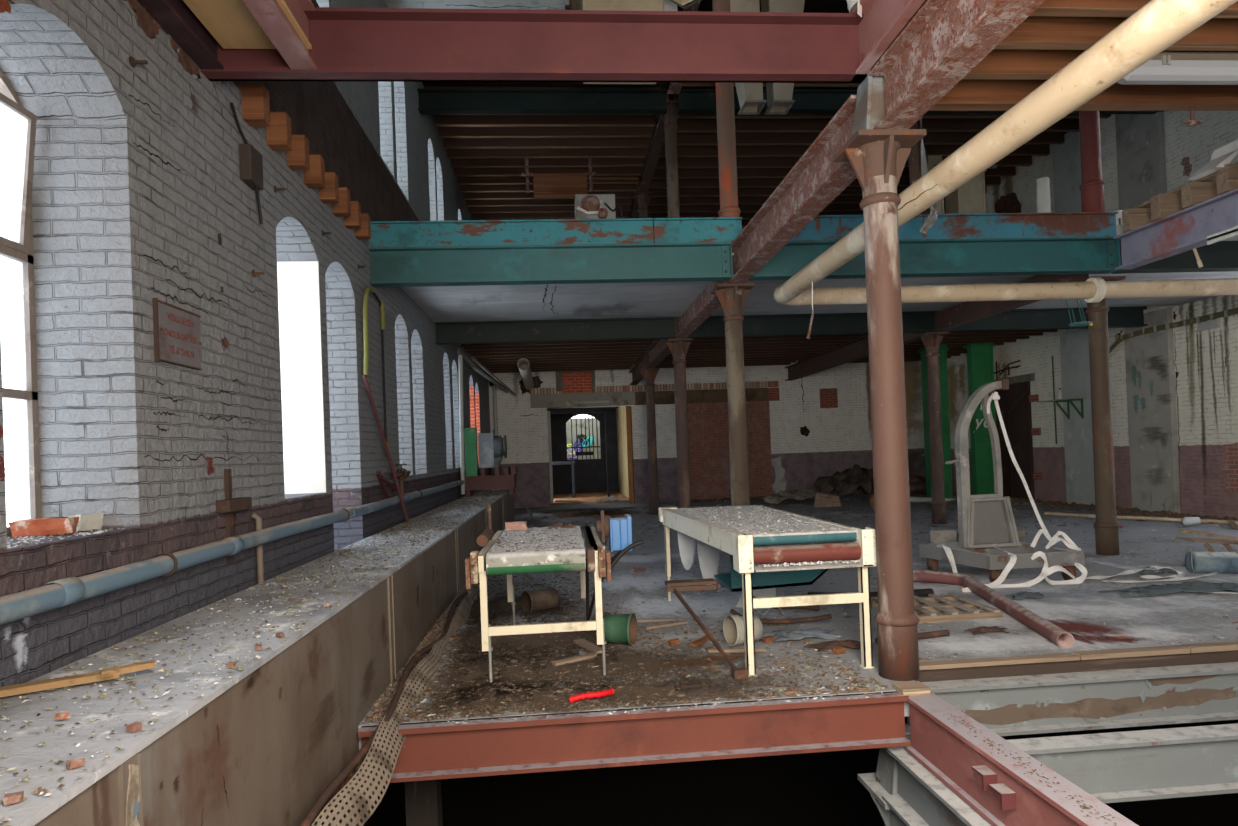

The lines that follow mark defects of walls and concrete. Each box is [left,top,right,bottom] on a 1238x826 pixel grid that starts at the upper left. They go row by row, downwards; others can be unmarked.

spalling [123,0,201,79]
crack [128,83,221,131]
crack [133,142,187,175]
crack [138,254,274,316]
leakage [1186,308,1230,469]
peeling [771,456,787,493]
spalling [1221,442,1238,491]
peeling [961,674,1238,725]